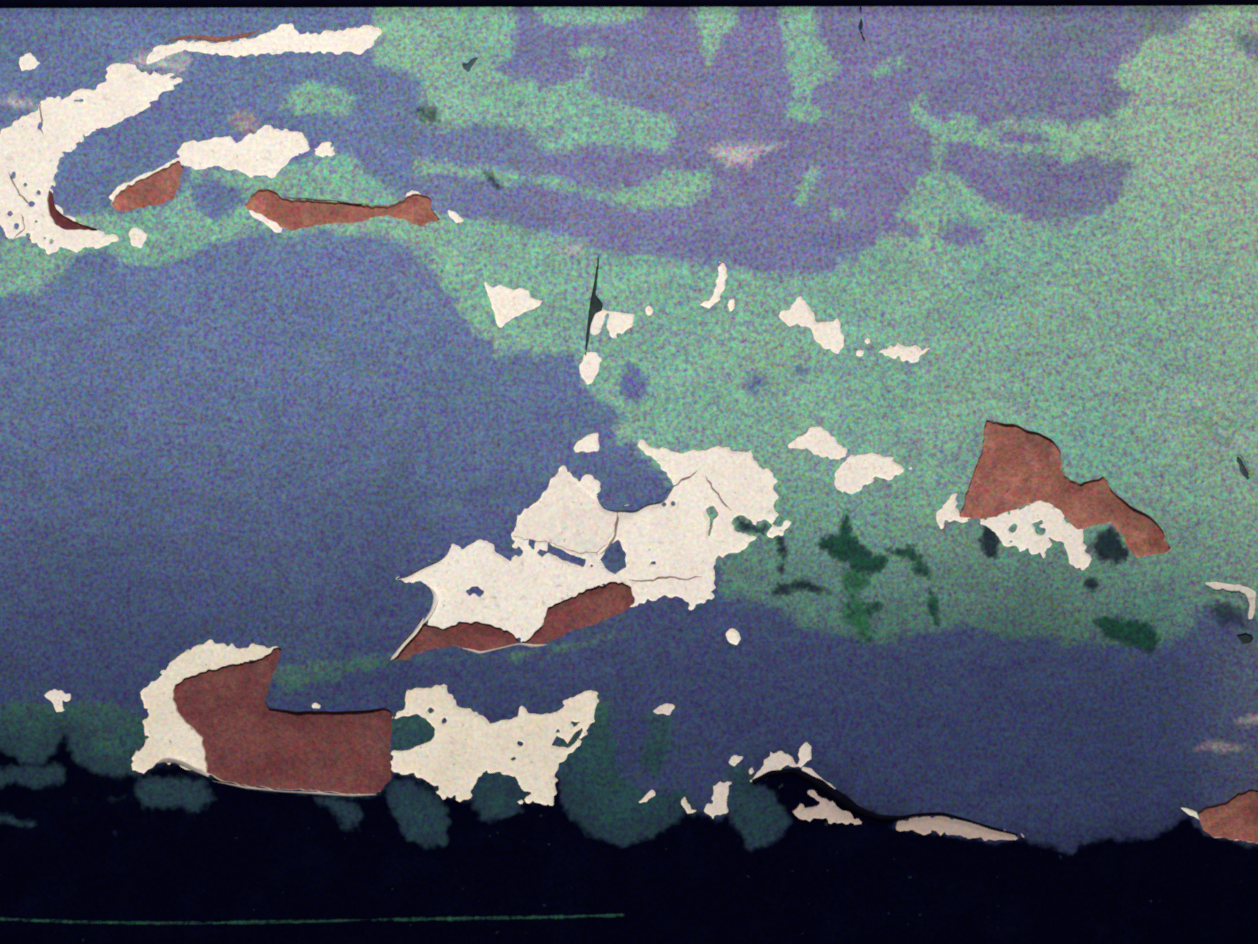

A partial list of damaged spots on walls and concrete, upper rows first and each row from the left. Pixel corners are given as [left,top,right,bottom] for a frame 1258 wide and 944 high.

peeling [0,23,382,254]
peeling [109,125,464,233]
peeling [485,282,542,328]
crack [585,257,603,356]
peeling [779,296,930,363]
peeling [788,426,912,494]
spalling [936,419,1171,570]
peeling [390,439,791,660]
spalling [132,639,599,805]
peeling [681,781,731,818]
peeling [729,742,862,825]
peeling [896,815,1024,841]